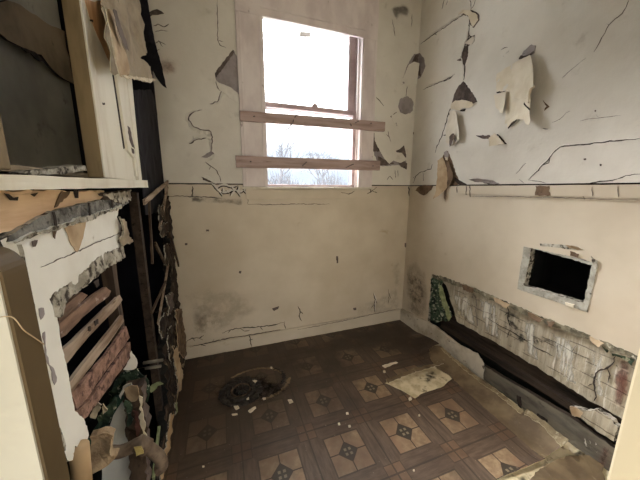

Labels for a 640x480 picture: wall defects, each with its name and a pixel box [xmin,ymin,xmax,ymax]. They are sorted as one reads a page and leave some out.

peeling [215,50,239,103]
crack [421,1,475,89]
flaking render [450,81,477,112]
peeling [494,44,549,129]
crack [595,0,629,50]
crack [185,83,224,181]
peeling [415,151,499,200]
crack [469,137,640,200]
flaking render [0,189,132,252]
crack [186,290,395,347]
spalling [429,274,638,419]
crack [458,297,616,401]